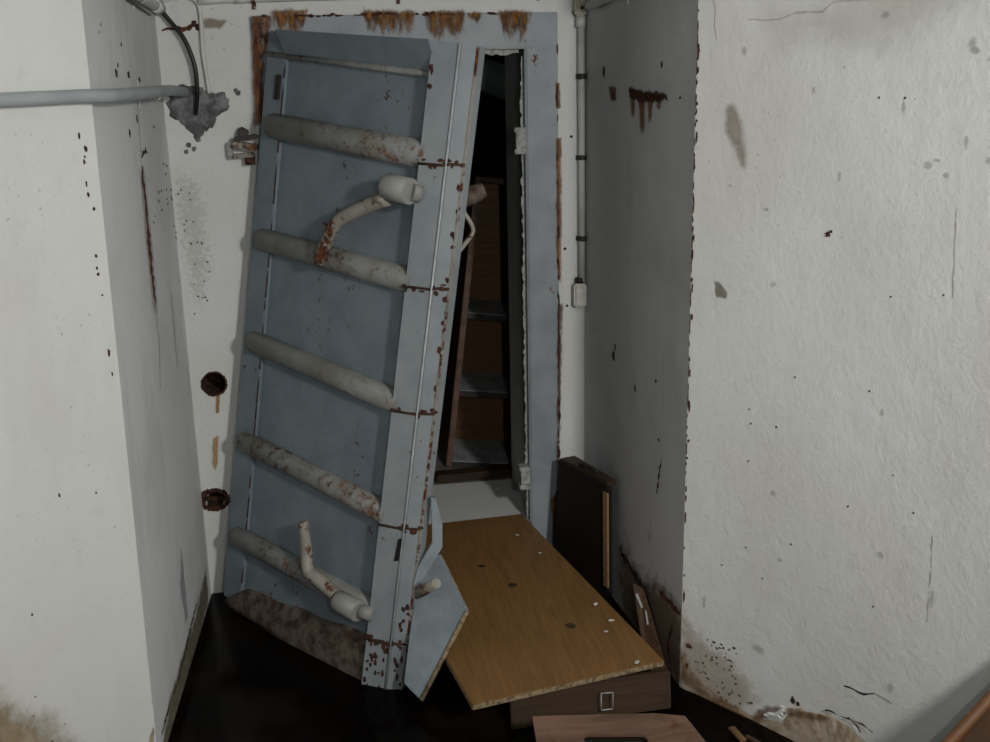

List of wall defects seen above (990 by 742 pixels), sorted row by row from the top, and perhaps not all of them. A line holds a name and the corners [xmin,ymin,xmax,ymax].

corrosion [252,9,529,127]
corrosion [629,87,667,130]
leakage [0,708,54,742]